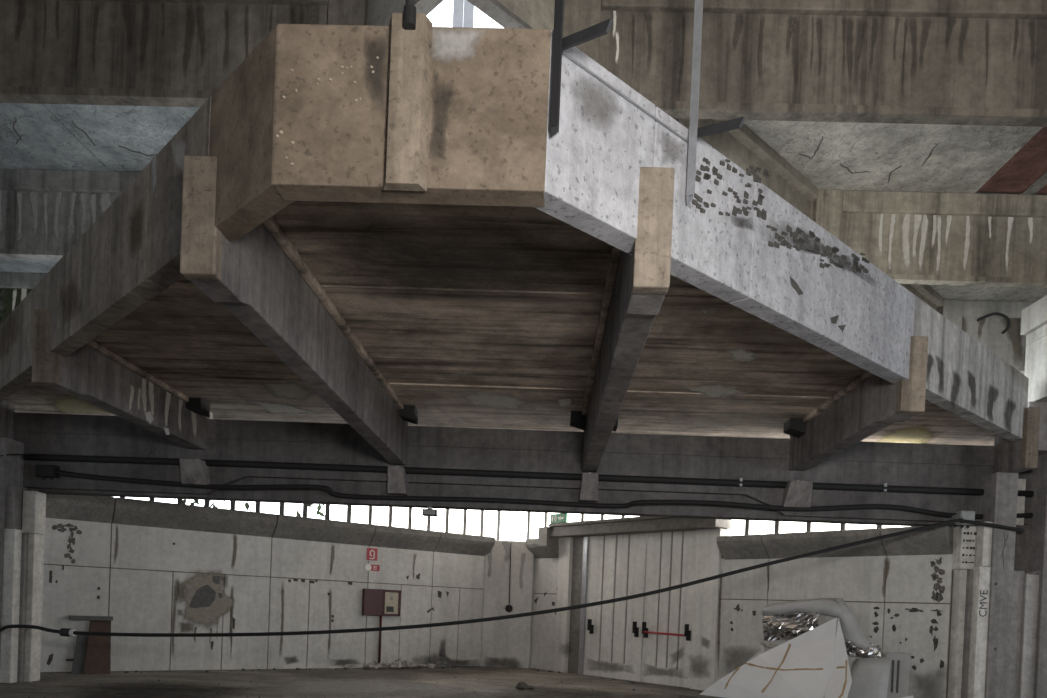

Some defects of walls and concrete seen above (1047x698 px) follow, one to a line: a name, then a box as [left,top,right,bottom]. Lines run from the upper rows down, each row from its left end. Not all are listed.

crack [72,121,157,156]
water stain [17,191,111,236]
peeling [692,157,870,274]
water stain [879,214,952,271]
water stain [1005,217,1014,270]
peeling [49,523,83,583]
spalling [189,576,223,608]
peeling [870,557,945,669]